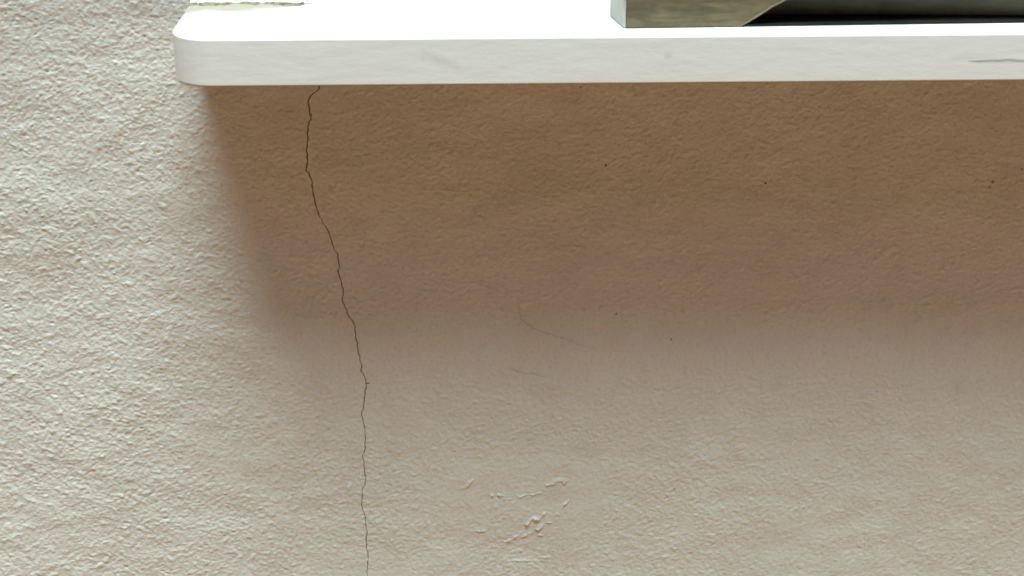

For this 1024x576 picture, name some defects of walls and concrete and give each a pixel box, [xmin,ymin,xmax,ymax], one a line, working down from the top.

crack [305,86,369,576]